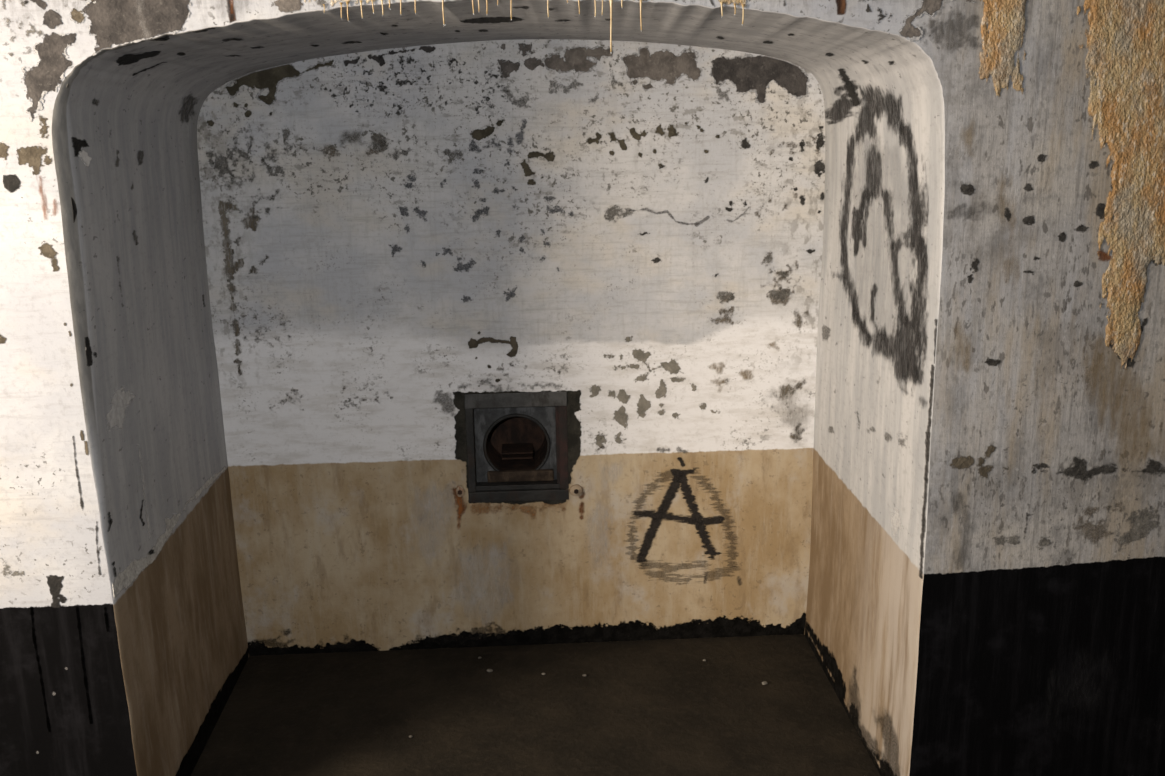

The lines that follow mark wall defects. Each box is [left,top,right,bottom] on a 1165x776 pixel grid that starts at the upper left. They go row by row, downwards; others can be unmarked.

rust [227,0,236,22]
peeling [0,0,215,175]
peeling [225,41,436,117]
peeling [497,41,812,104]
crack [625,208,741,226]
spalling [1096,203,1105,219]
rust [453,489,565,527]